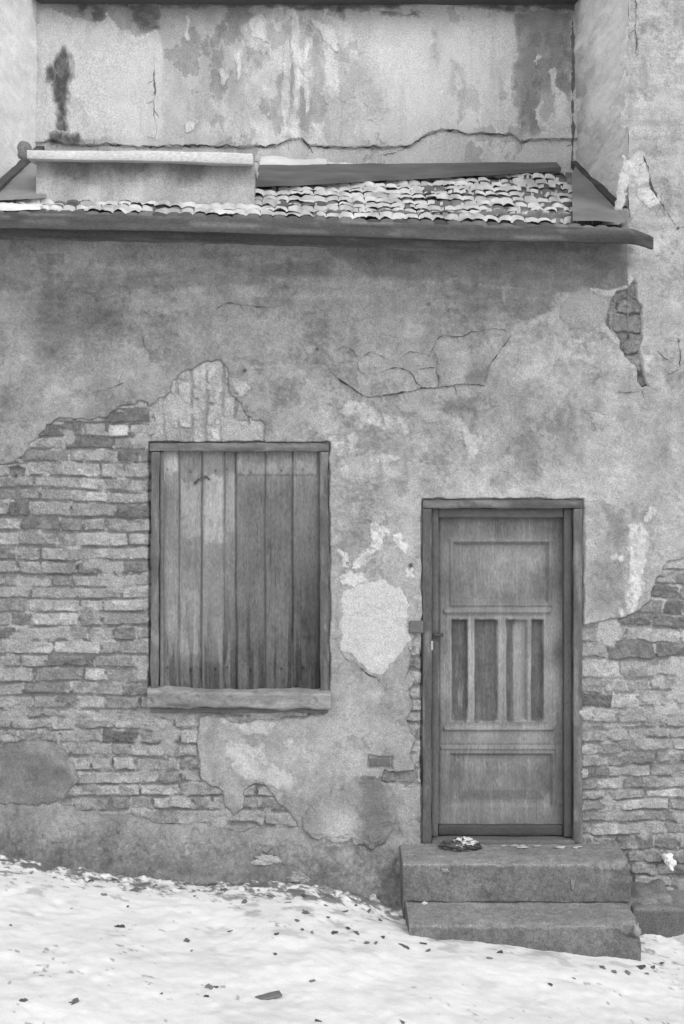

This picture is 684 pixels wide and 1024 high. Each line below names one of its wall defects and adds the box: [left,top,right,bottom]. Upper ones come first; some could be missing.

leakage [44,45,86,149]
crack [85,13,576,161]
leakage [337,52,391,125]
leakage [427,28,468,100]
leakage [491,10,575,139]
flaking render [614,150,660,210]
crack [328,328,511,401]
flaking render [589,271,655,387]
peeling [326,398,410,457]
flaking render [0,360,323,832]
flaking render [367,633,422,787]
flaking render [579,505,684,891]